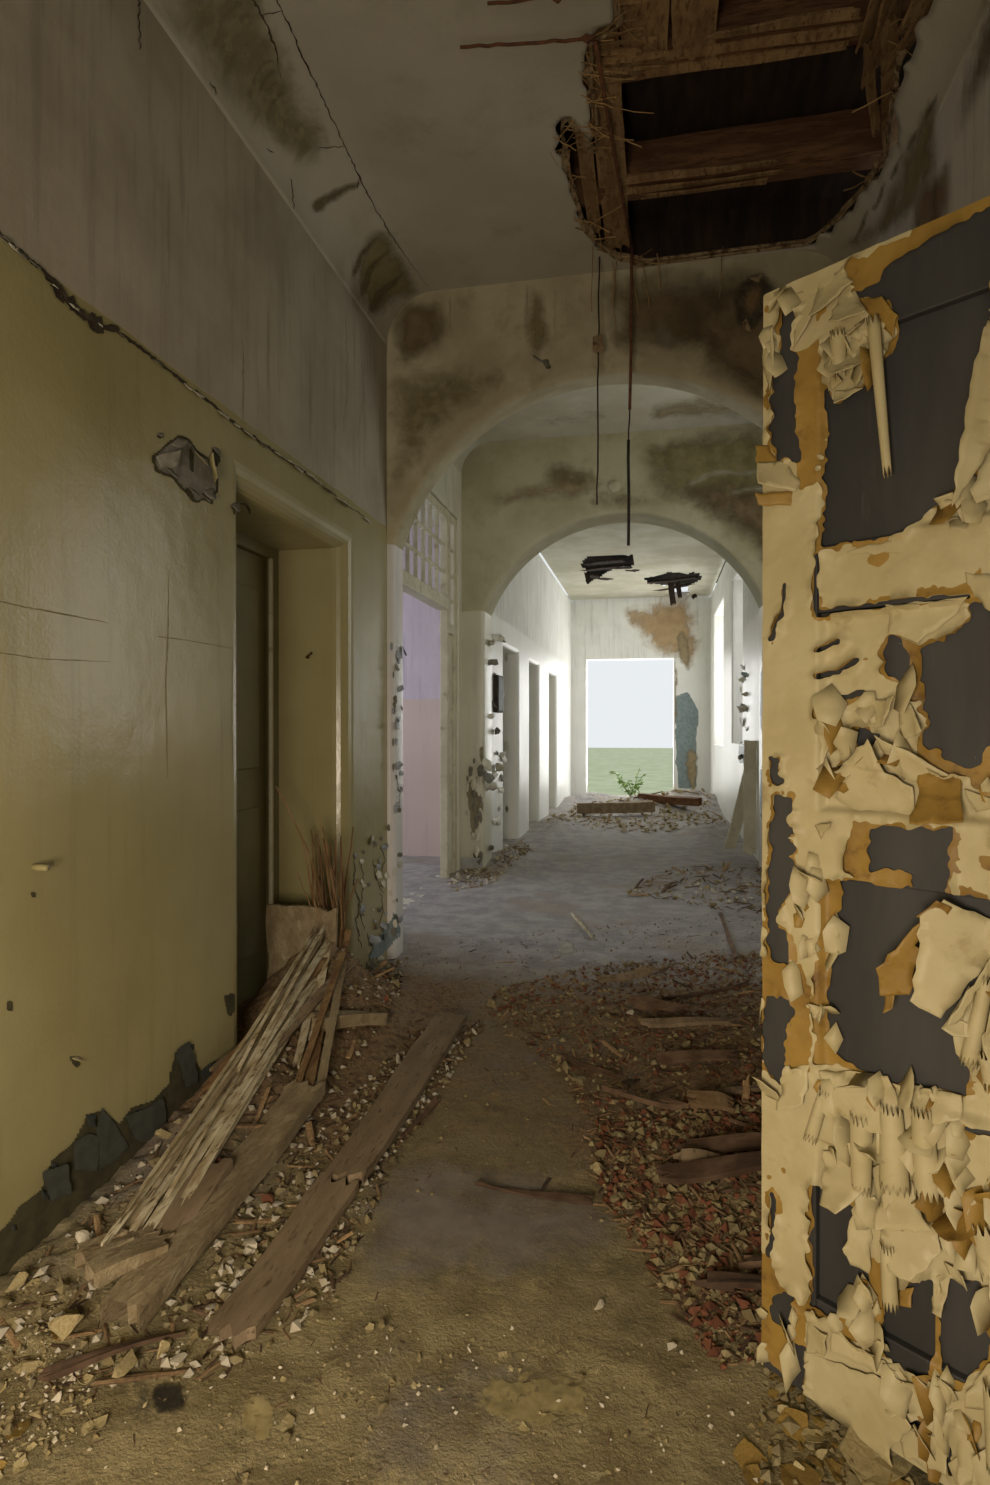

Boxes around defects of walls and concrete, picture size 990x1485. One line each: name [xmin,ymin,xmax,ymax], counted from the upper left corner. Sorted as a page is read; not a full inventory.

damp [186,0,315,154]
damp [314,185,358,212]
damp [857,101,935,237]
damp [354,237,441,355]
peeling [0,232,371,523]
damp [650,435,763,544]
peeling [934,318,990,523]
peeling [818,734,990,825]
peeling [876,899,990,1063]
peeling [0,1042,216,1294]
peeling [818,1070,963,1134]
peeling [819,1151,967,1318]